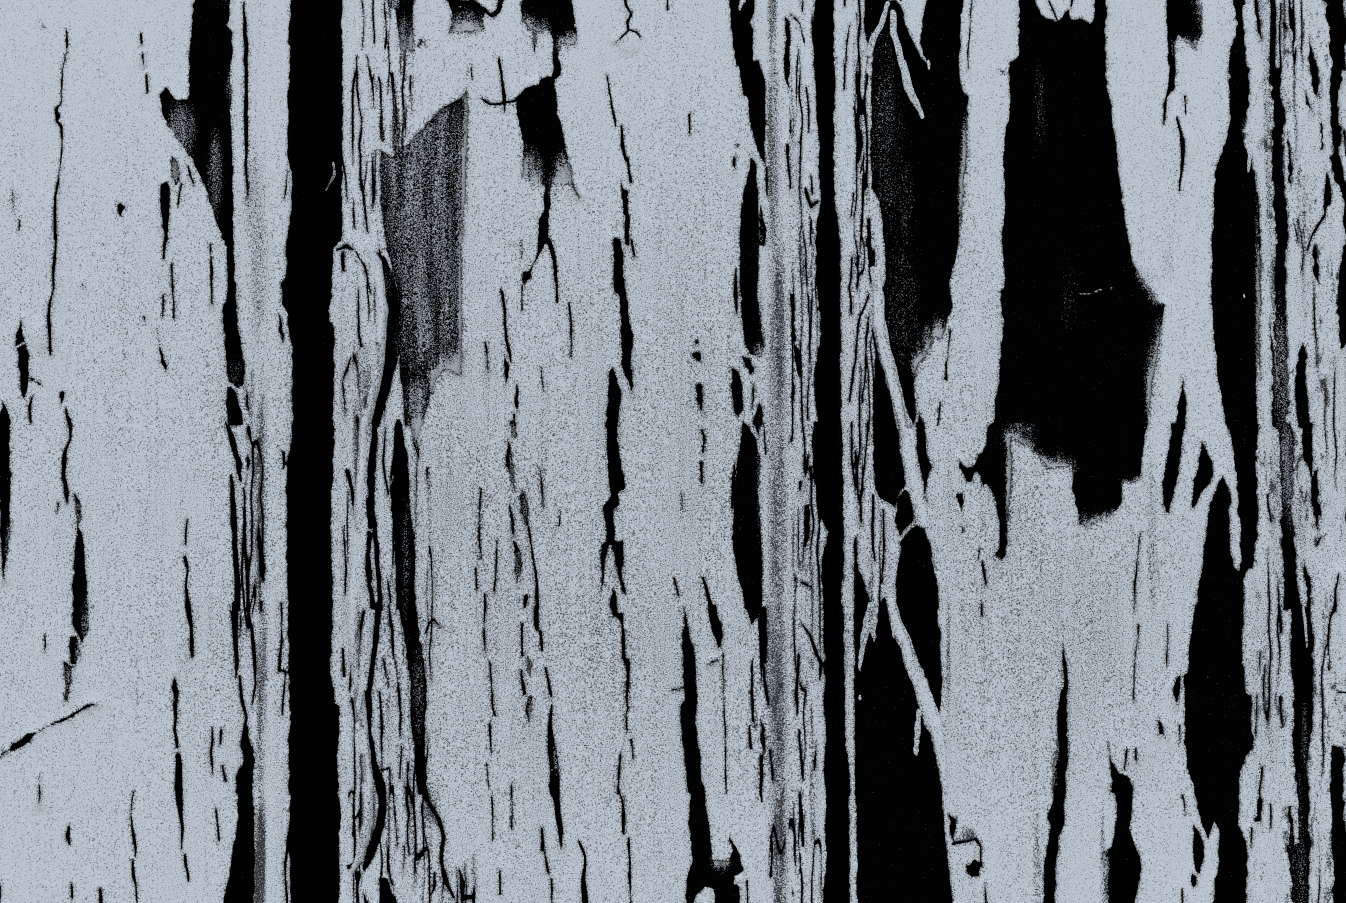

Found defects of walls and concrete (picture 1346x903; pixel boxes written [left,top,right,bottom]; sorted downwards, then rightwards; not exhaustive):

crack [130,792,138,903]
peeling [160,0,249,489]
crack [172,426,294,882]
crack [284,829,295,903]
crack [447,0,504,33]
peeling [374,0,579,903]
crack [475,289,588,903]
crack [600,76,635,903]
peeling [729,0,768,624]
peeling [853,0,987,903]
peeling [956,0,1165,559]
peeling [1158,0,1321,903]